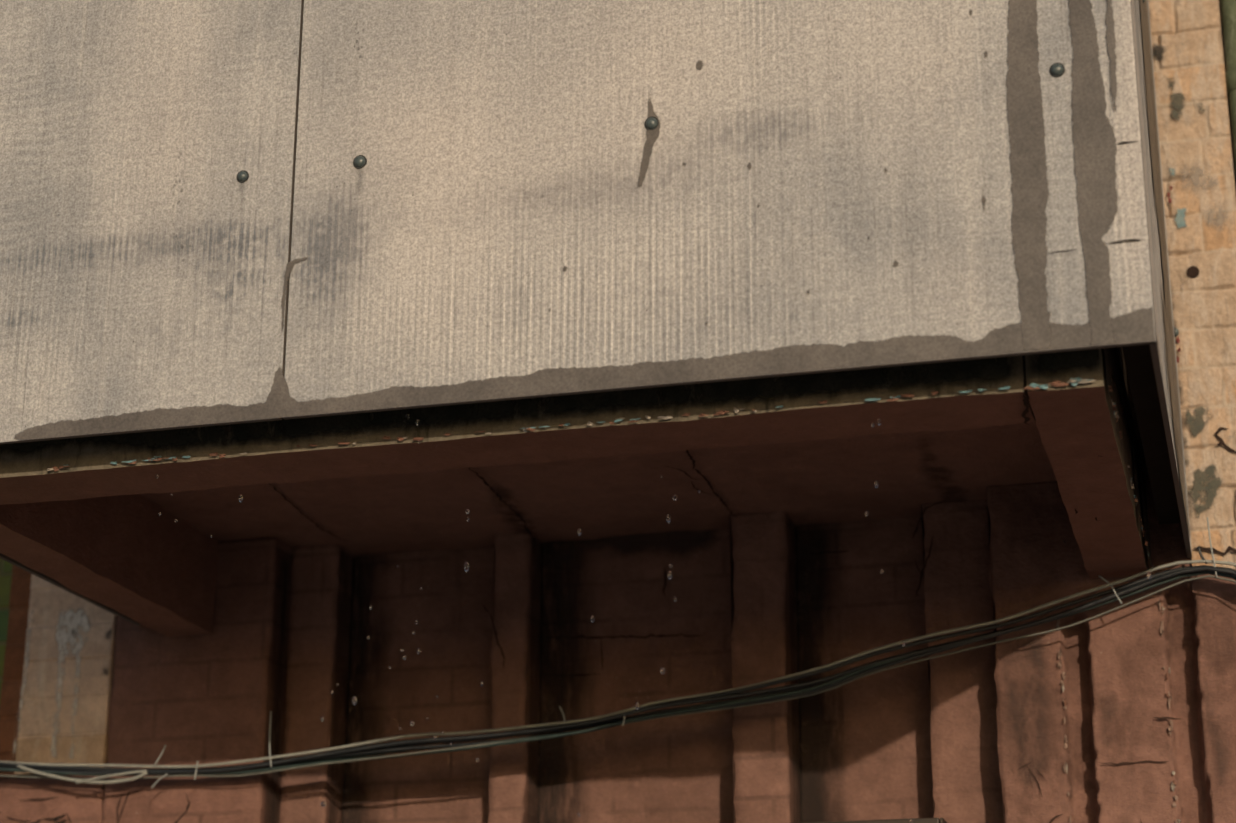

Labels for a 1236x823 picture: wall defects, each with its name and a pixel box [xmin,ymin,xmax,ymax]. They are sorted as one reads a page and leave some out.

damp [0,0,1222,568]
crack [1022,393,1031,425]
crack [116,792,130,823]
crack [175,794,190,823]